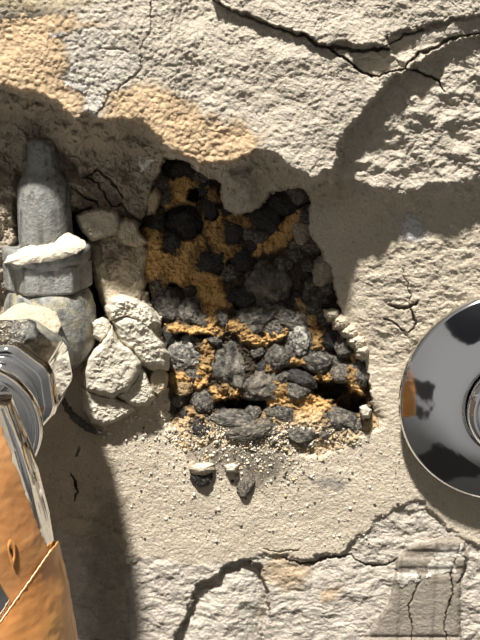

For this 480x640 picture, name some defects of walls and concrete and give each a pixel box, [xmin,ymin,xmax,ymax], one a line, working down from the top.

crack [213,0,472,88]
spalling [0,27,380,459]
crack [389,290,418,331]
crack [268,549,394,567]